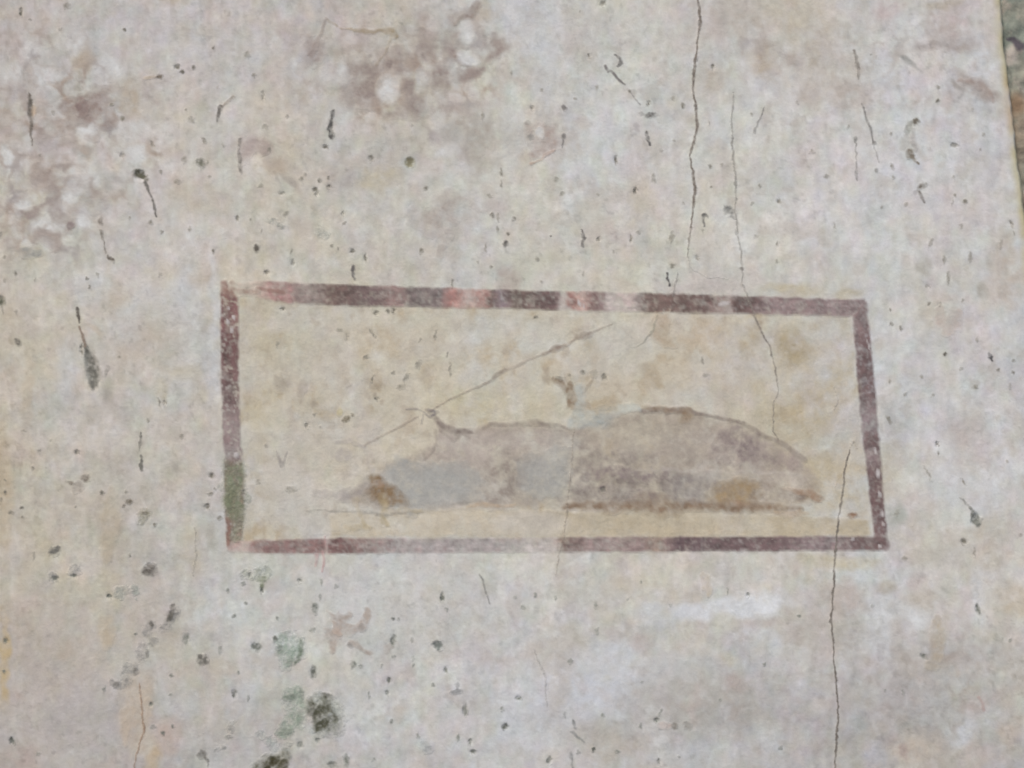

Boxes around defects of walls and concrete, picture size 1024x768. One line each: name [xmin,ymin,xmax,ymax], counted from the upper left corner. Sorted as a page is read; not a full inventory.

crack [671,0,779,441]
crack [828,440,858,768]